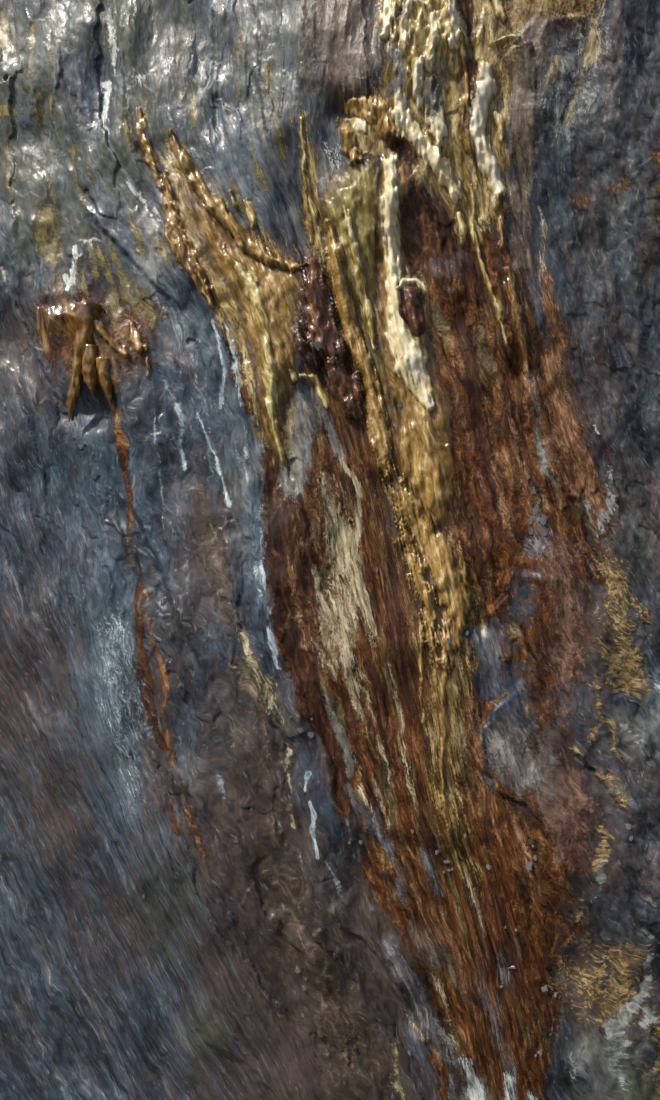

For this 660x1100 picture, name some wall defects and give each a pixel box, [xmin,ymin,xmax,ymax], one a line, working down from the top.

damp [132,74,148,121]
damp [155,37,197,128]
damp [262,0,547,296]
damp [528,1,611,158]
damp [63,227,185,328]
rust [190,481,247,646]
damp [127,128,568,940]
rust [258,0,660,1100]
damp [95,612,153,826]
rust [228,660,406,1100]